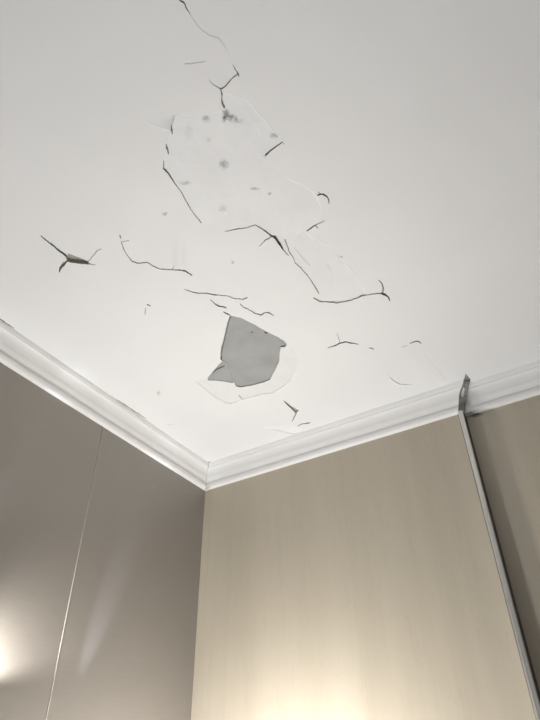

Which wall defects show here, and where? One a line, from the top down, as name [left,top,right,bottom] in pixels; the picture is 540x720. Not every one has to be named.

crack [179,0,239,108]
crack [163,125,201,222]
crack [120,235,274,316]
crack [225,225,390,303]
flaking render [195,316,298,404]